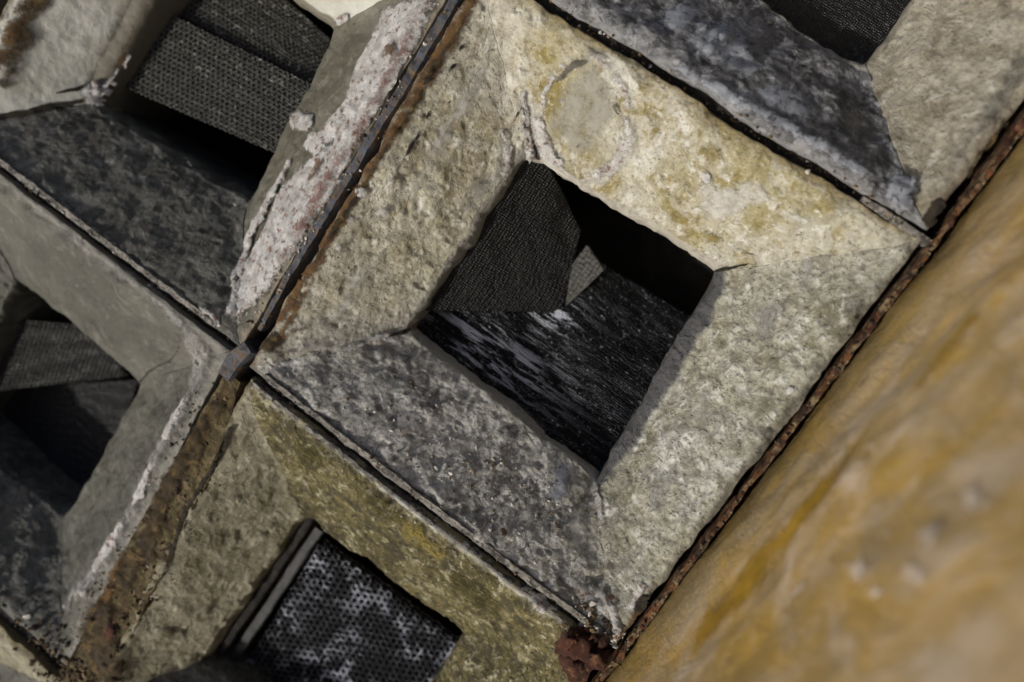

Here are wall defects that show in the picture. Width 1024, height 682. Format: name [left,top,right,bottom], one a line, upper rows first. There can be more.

rust [259,0,477,353]
rust [78,402,224,682]
rust [554,101,1024,682]